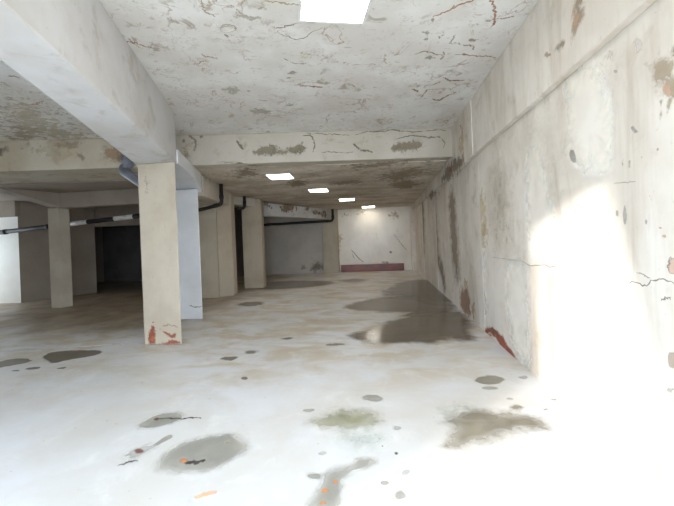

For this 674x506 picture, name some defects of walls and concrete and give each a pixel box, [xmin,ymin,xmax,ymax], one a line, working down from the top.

crack [431,0,514,26]
peeling [253,144,305,155]
crack [323,129,446,154]
peeling [391,135,445,152]
leakage [345,154,464,189]
crack [629,273,674,301]
rust [148,322,180,345]